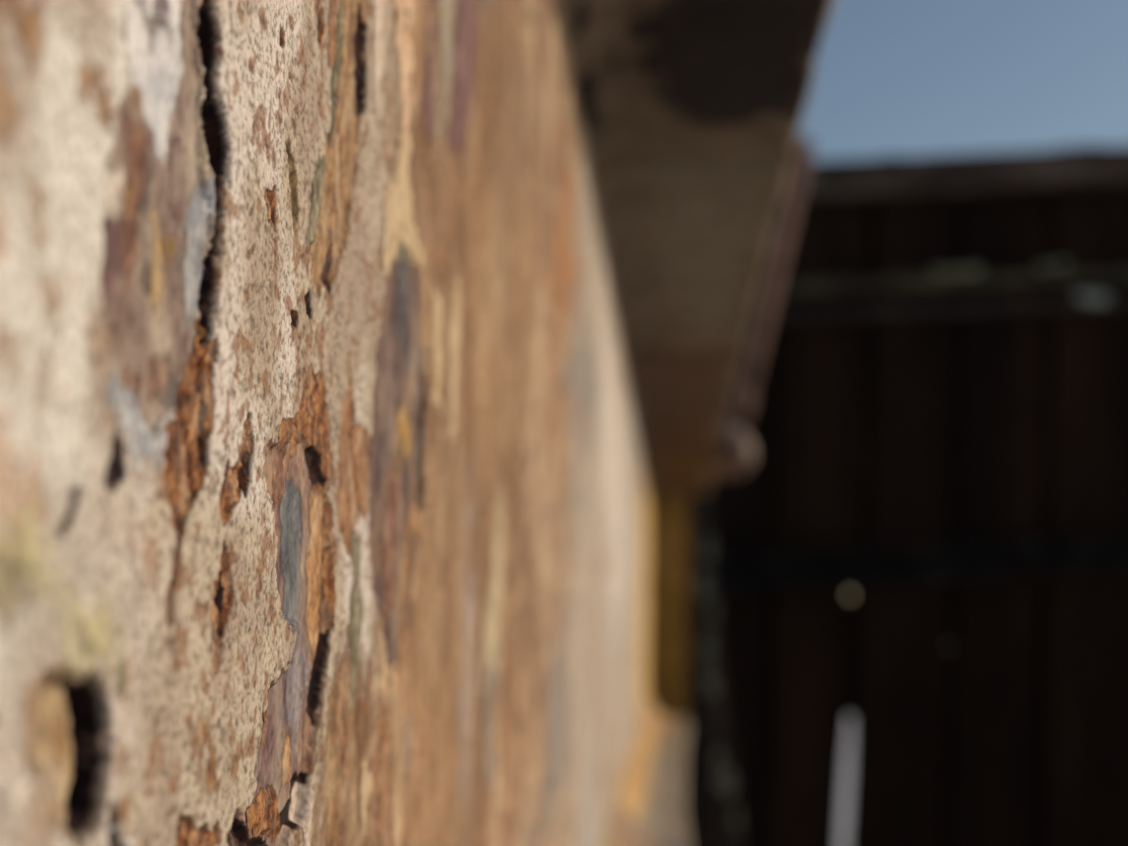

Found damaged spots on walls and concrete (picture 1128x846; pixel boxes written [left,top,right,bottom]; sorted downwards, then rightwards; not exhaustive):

peeling [100,0,218,537]
crack [193,0,225,347]
spalling [176,0,477,846]
spalling [56,678,99,837]
peeling [107,796,133,846]